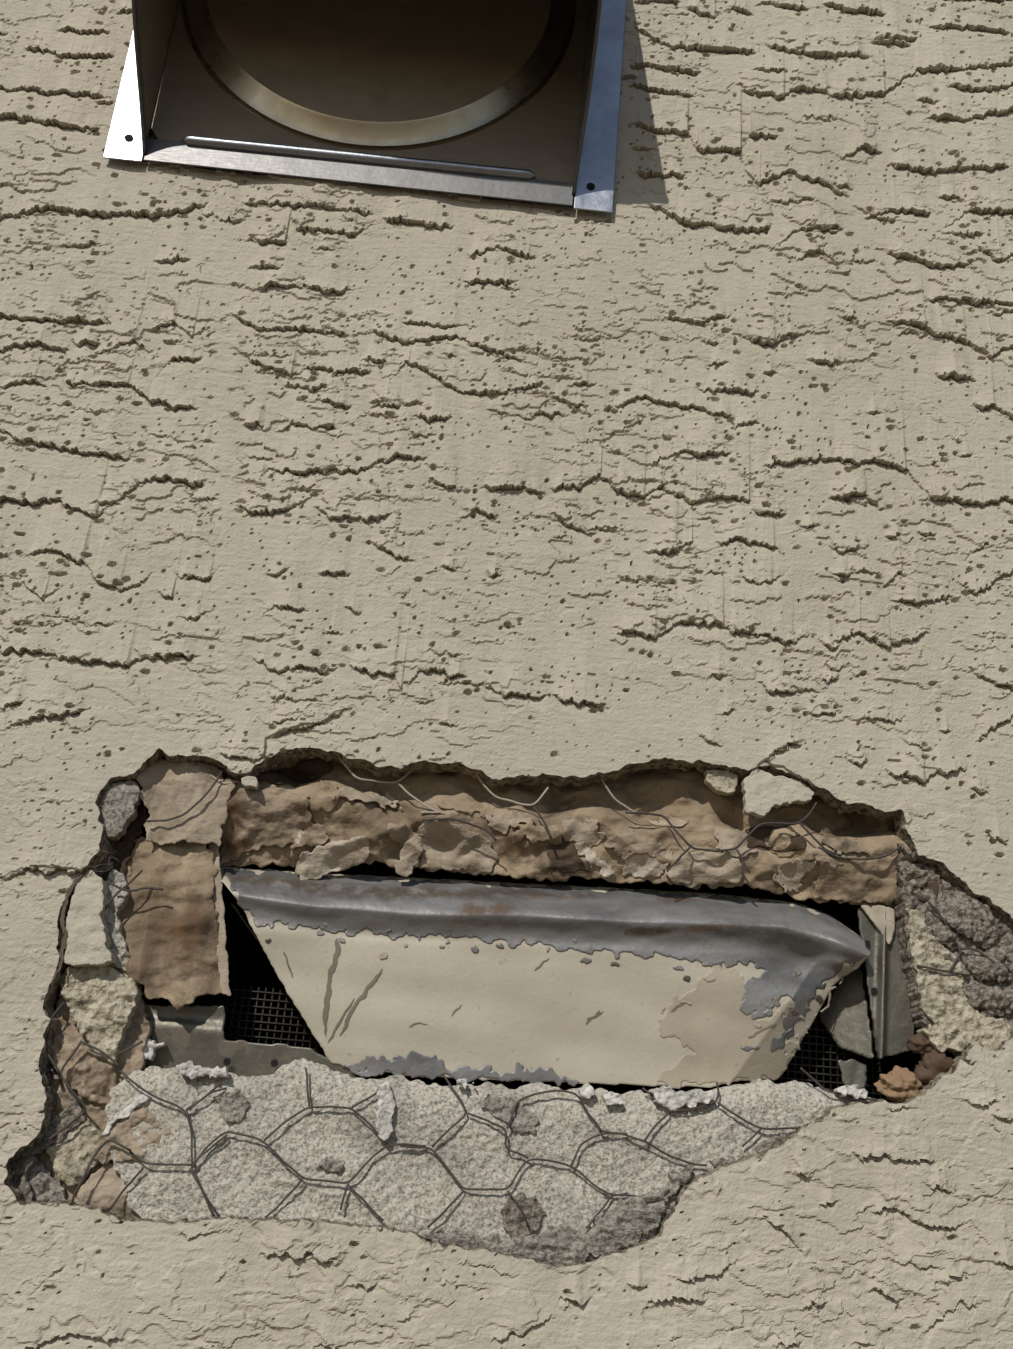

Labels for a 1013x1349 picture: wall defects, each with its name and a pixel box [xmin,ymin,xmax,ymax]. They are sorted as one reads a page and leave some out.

flaking render [4,747,1013,1268]